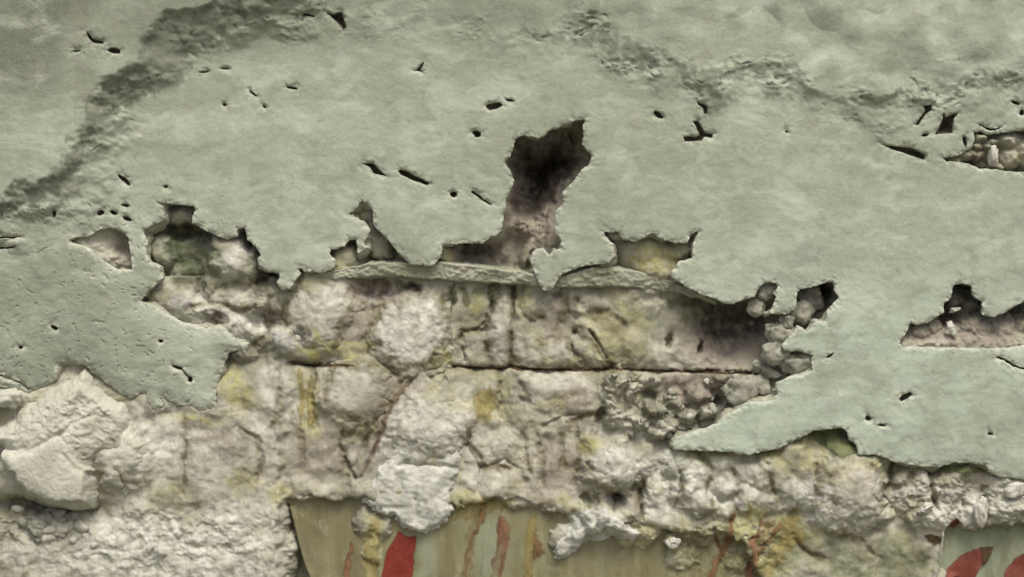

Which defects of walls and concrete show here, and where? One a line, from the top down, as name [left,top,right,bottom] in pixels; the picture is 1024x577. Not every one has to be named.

damp [1,0,251,216]
spalling [915,105,1024,172]
damp [451,285,469,309]
crack [291,361,354,369]
spalling [0,120,1024,577]
crack [452,365,752,375]
damp [473,388,496,420]
damp [361,443,509,577]
corrosion [462,498,487,574]
corrosion [491,517,510,577]
corrosion [523,515,545,577]
damp [553,507,642,559]